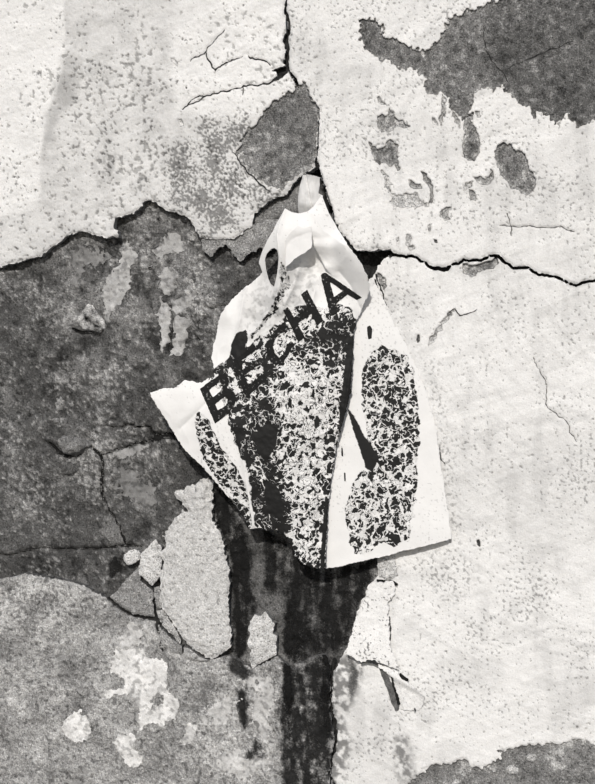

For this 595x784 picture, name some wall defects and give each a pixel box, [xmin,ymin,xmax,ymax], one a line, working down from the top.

crack [182,4,299,110]
spalling [235,81,320,190]
peeling [358,0,595,161]
peeling [463,142,536,201]
crack [389,253,595,287]
crack [0,423,178,556]
damp [214,484,257,679]
damp [236,689,249,729]
damp [245,740,265,760]
damp [263,530,376,784]
crack [329,657,338,784]
peeling [346,581,425,711]